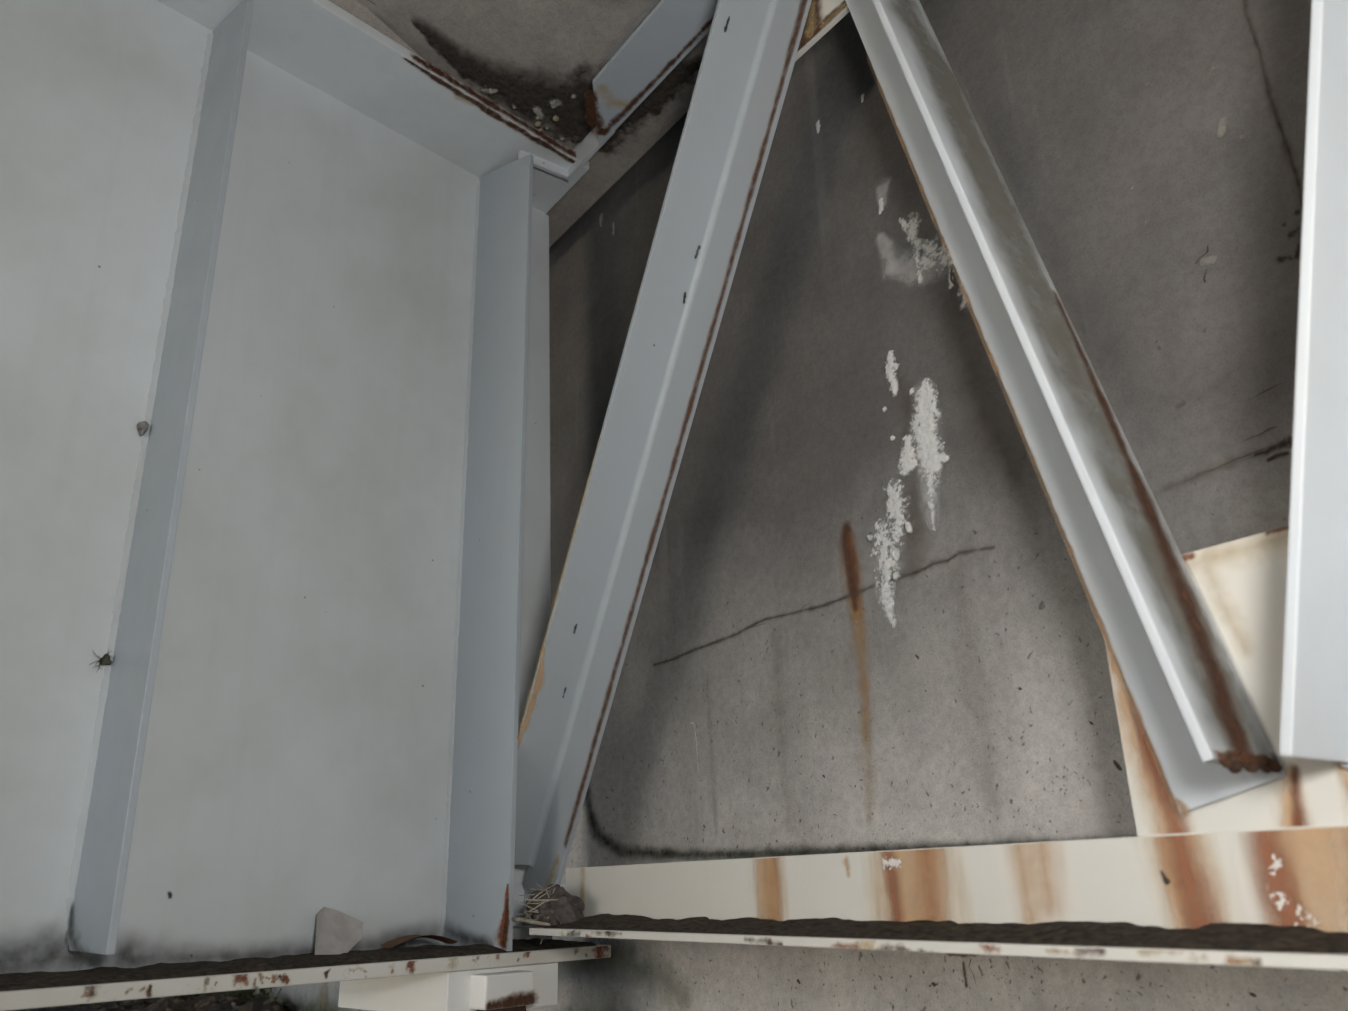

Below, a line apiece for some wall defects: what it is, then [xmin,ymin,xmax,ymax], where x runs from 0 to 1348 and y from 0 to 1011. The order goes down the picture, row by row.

rust [404,55,576,164]
efflorescence [877,181,889,215]
efflorescence [877,212,967,309]
rust [564,0,847,846]
efflorescence [867,350,950,628]
crack [654,551,970,665]
rust [843,523,867,738]
rust [1054,292,1334,932]
rust [757,858,780,921]
rust [883,849,944,922]